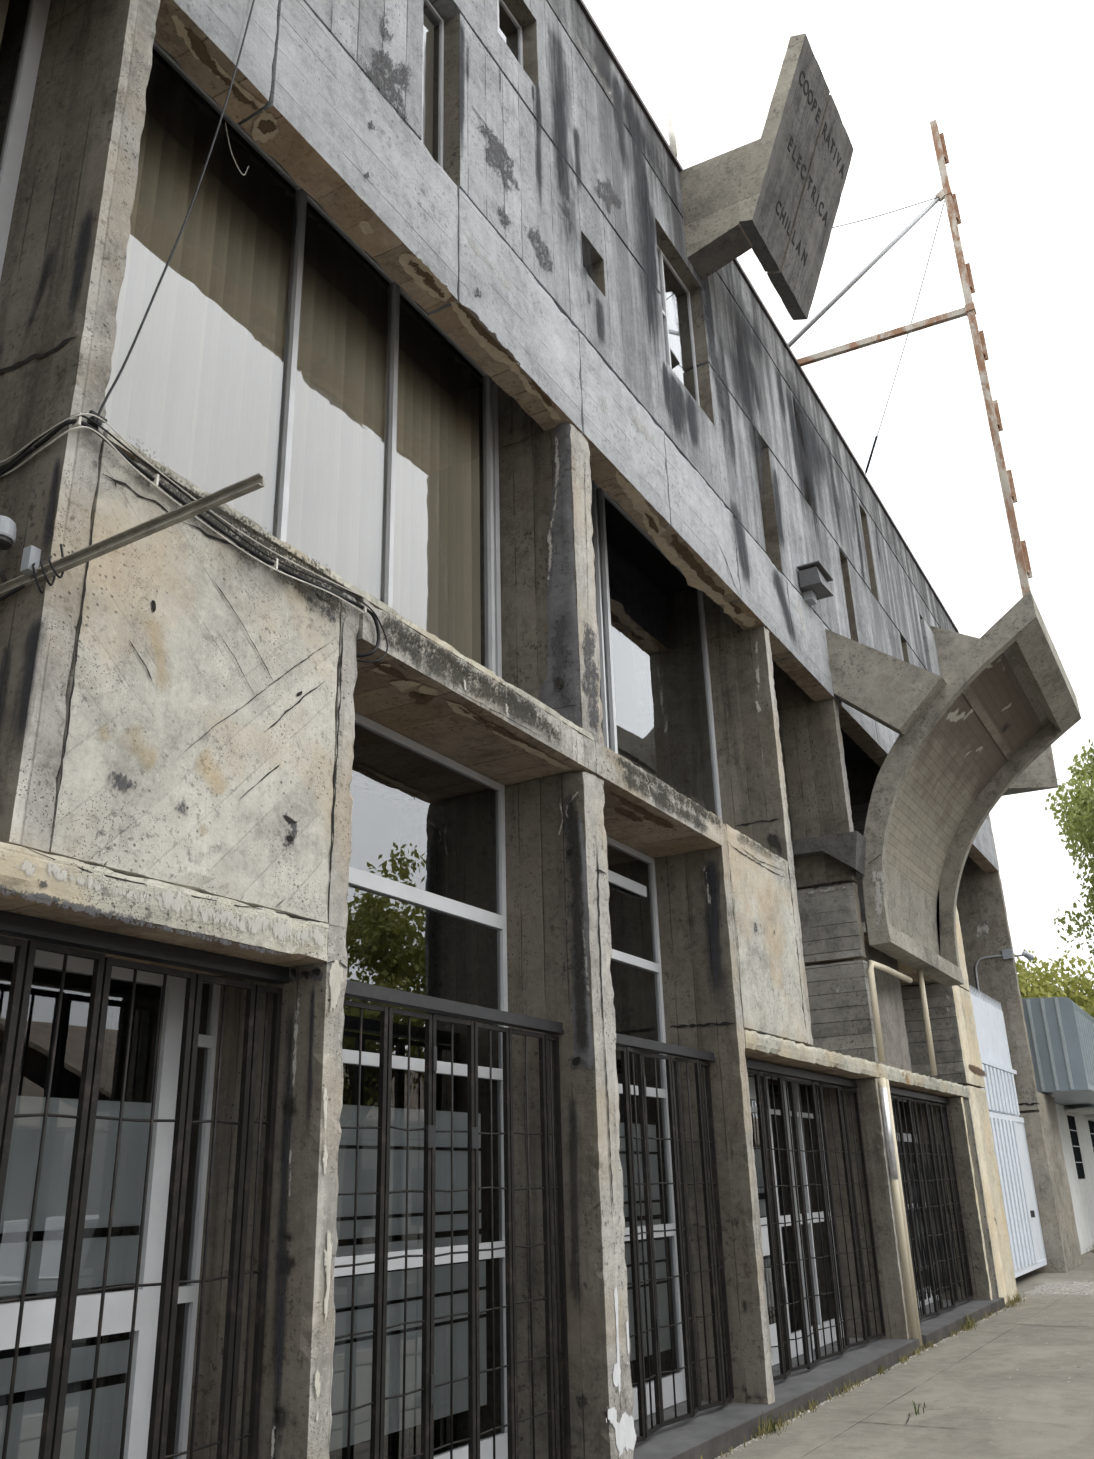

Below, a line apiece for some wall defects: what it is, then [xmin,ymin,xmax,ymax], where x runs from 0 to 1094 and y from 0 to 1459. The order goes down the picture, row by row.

peeling [171,15,279,143]
spalling [361,15,412,123]
spalling [479,123,553,271]
damp [532,33,581,237]
damp [607,78,661,343]
peeling [399,253,561,580]
damp [694,268,784,544]
peeling [616,471,761,712]
damp [733,503,750,582]
damp [773,572,795,639]
damp [384,629,579,764]
peeling [606,1285,636,1457]